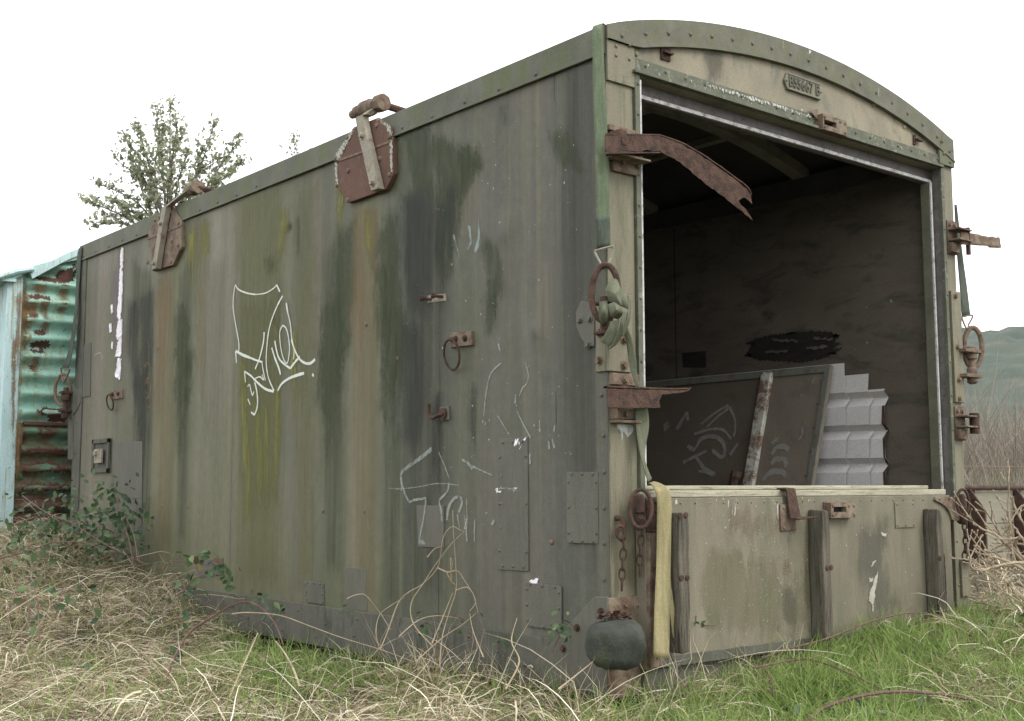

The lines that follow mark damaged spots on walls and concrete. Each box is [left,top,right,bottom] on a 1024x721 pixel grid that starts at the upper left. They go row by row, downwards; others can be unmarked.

rust [11,264,77,528]
peeling [869,560,878,611]